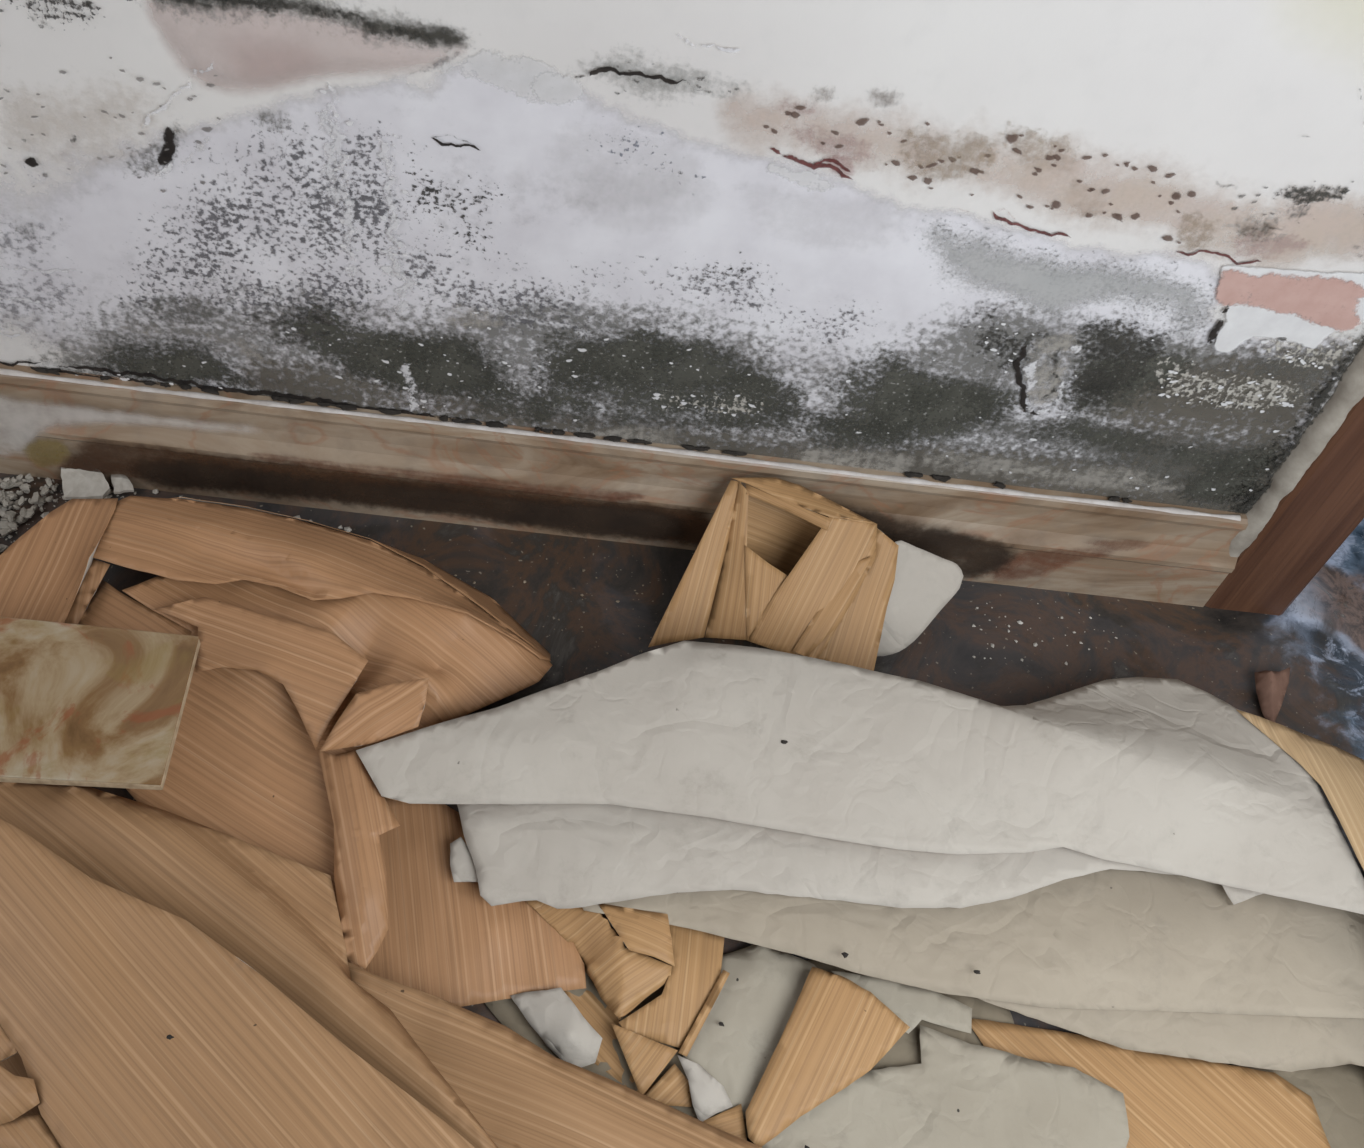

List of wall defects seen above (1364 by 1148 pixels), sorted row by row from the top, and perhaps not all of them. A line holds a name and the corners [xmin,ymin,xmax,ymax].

crack [576,67,738,94]
leakage [0,223,86,332]
peeling [0,50,1364,505]
leakage [41,103,1364,514]
leakage [0,400,710,545]
leakage [851,510,1014,578]